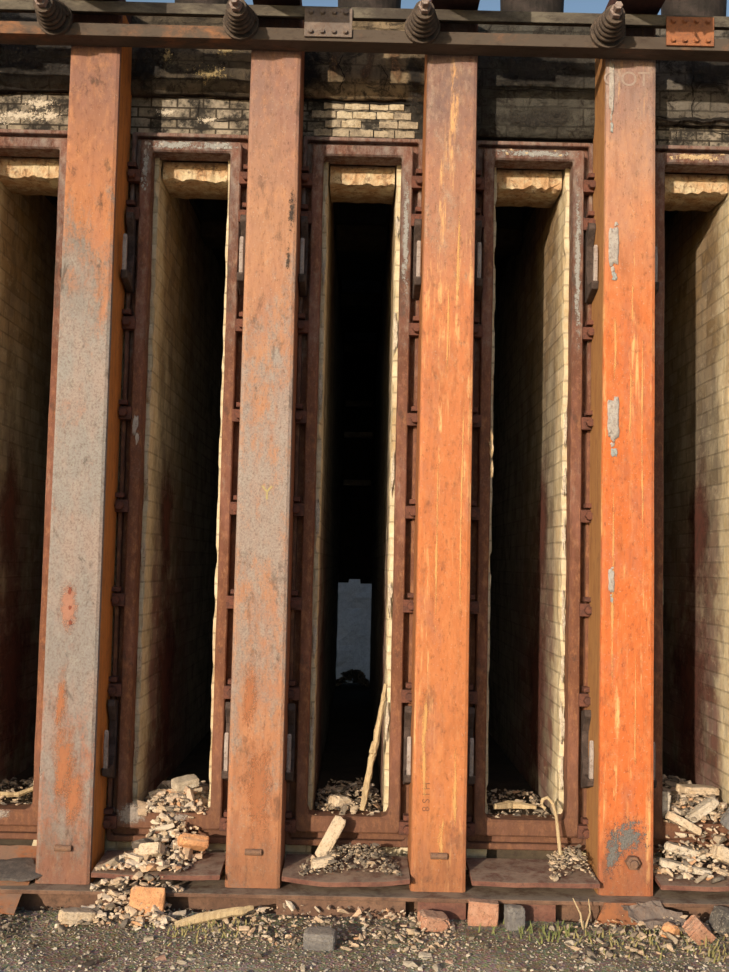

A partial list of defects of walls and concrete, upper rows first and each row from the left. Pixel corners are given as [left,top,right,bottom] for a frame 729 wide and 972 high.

peeling [608,222,619,280]
peeling [607,397,619,457]
leakage [688,469,709,591]
corrosion [61,585,77,631]
leakage [673,619,705,769]
corrosion [55,683,82,825]
peeling [605,817,649,879]